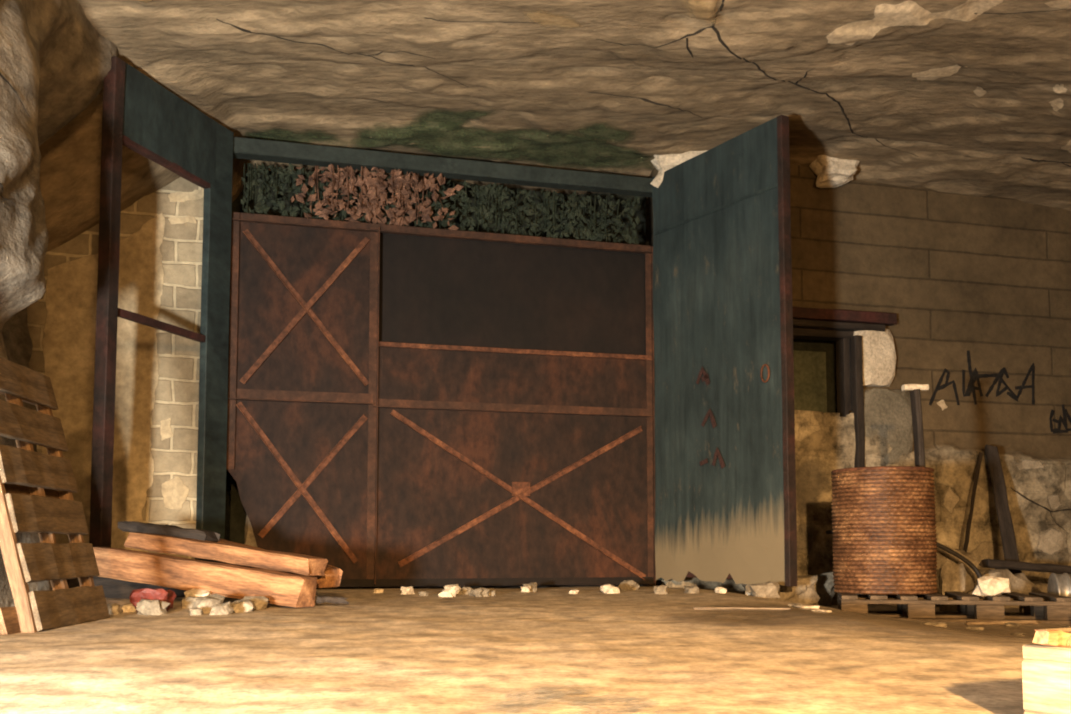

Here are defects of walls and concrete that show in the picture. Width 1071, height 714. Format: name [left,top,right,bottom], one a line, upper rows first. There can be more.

crack [424,16,532,24]
spalling [826,0,1004,46]
crack [0,73,30,117]
crack [577,0,918,157]
spalling [912,64,969,81]